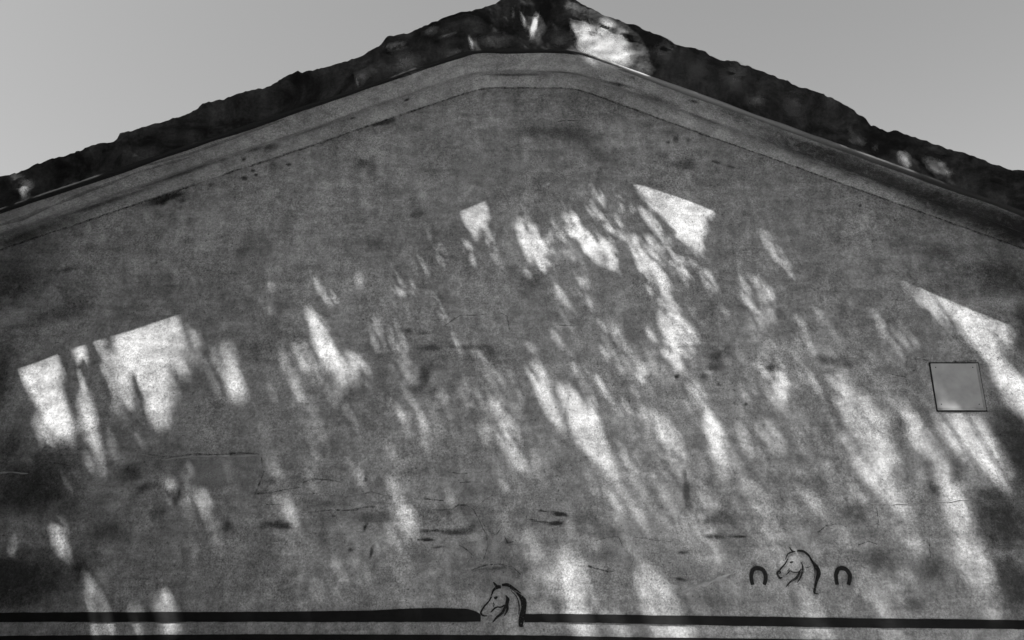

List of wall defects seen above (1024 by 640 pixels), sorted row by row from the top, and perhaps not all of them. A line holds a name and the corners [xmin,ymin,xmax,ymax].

crack [144,452,391,513]